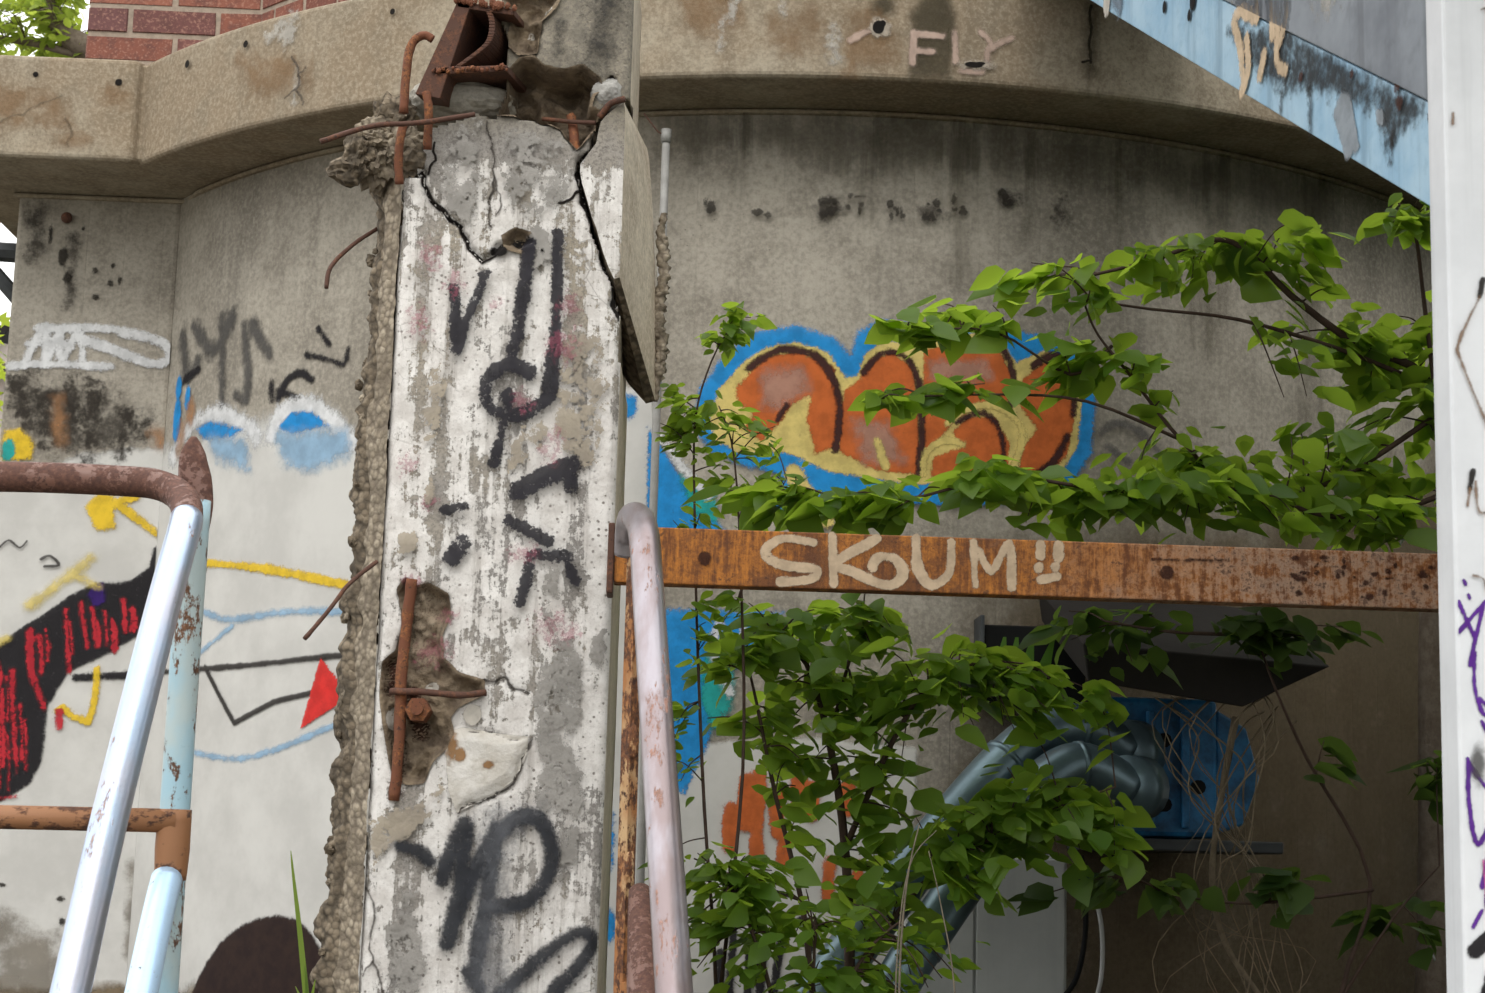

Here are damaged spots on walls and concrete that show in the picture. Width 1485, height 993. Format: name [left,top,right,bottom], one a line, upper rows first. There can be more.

peeling [1103,0,1123,18]
peeling [1229,27,1424,163]
crack [411,121,504,264]
crack [558,75,620,322]
water stain [704,200,716,214]
water stain [818,193,864,220]
water stain [887,193,968,221]
water stain [6,371,164,463]
spalling [303,0,626,993]
corrosion [698,551,711,566]
corrosion [1151,558,1229,579]
corrosion [1290,555,1403,600]